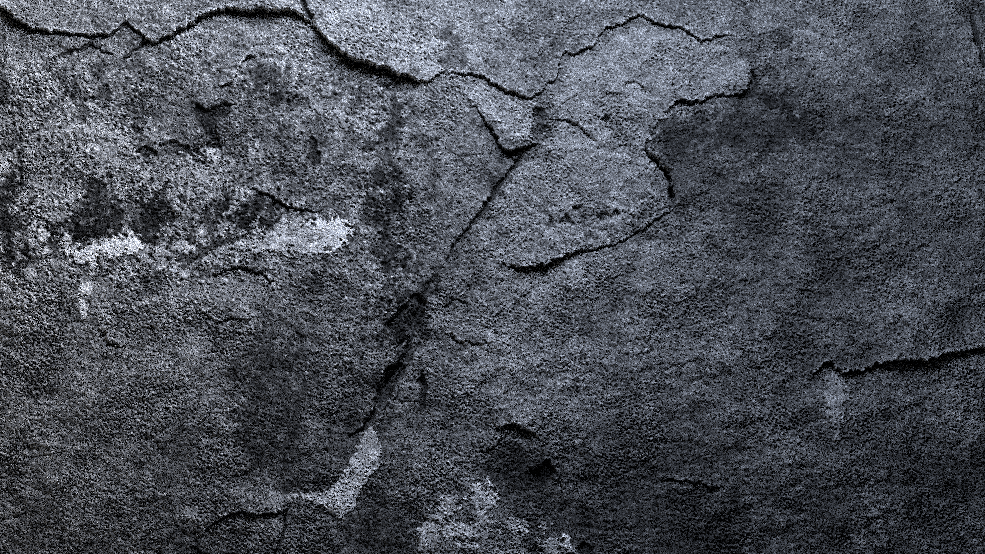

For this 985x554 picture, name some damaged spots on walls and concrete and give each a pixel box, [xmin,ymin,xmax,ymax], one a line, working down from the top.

crack [300,0,314,28]
crack [52,38,148,62]
crack [445,157,522,261]
crack [645,151,676,210]
crack [349,281,469,438]